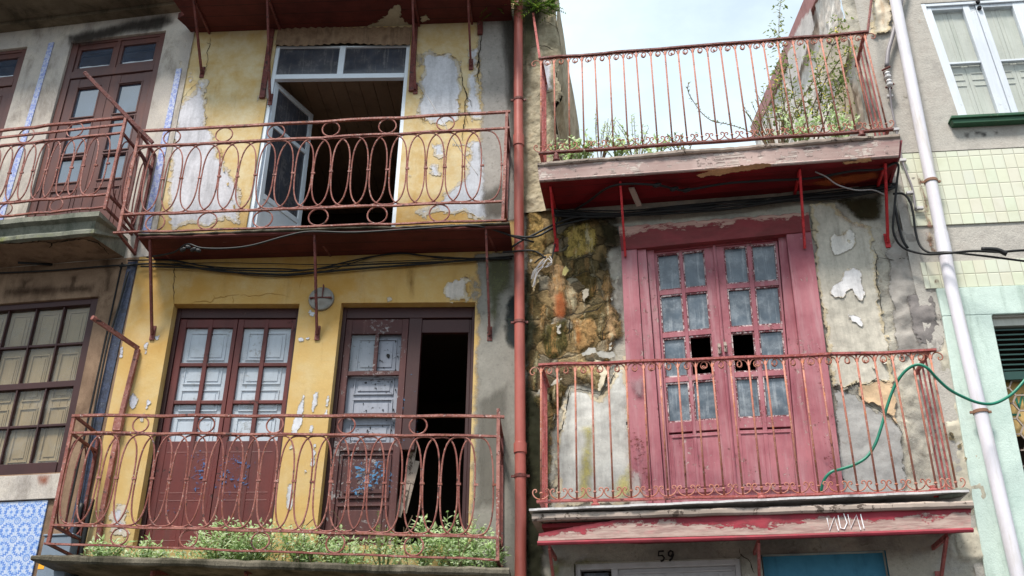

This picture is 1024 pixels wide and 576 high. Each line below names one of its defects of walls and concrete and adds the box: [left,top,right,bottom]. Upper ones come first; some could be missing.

peeling [167,40,242,230]
peeling [416,47,483,126]
peeling [415,140,487,220]
peeling [697,163,771,178]
peeling [443,274,479,303]
leakage [489,260,536,366]
flaking render [525,210,624,505]
leakage [596,217,618,269]
flaking render [824,179,944,492]
peeling [289,392,330,473]
leakage [479,391,506,503]
leakage [525,380,549,576]